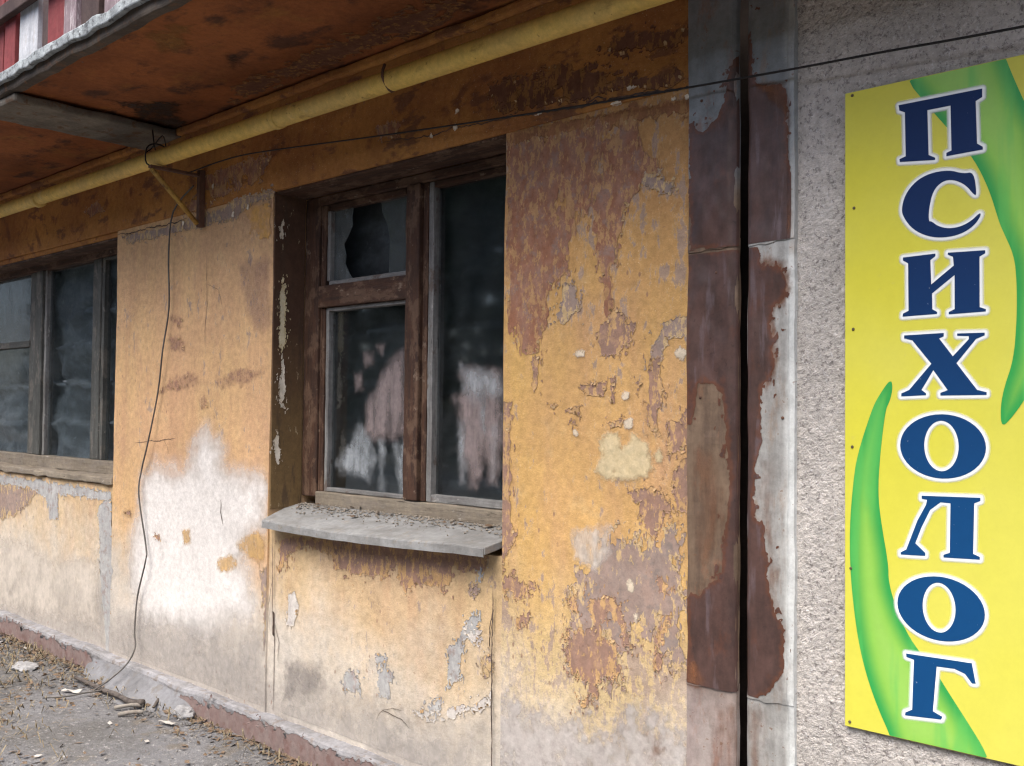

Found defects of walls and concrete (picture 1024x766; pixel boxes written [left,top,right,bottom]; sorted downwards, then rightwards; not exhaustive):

peeling [122,184,288,251]
peeling [218,21,791,766]
flaking render [0,473,132,527]
peeling [0,616,97,669]